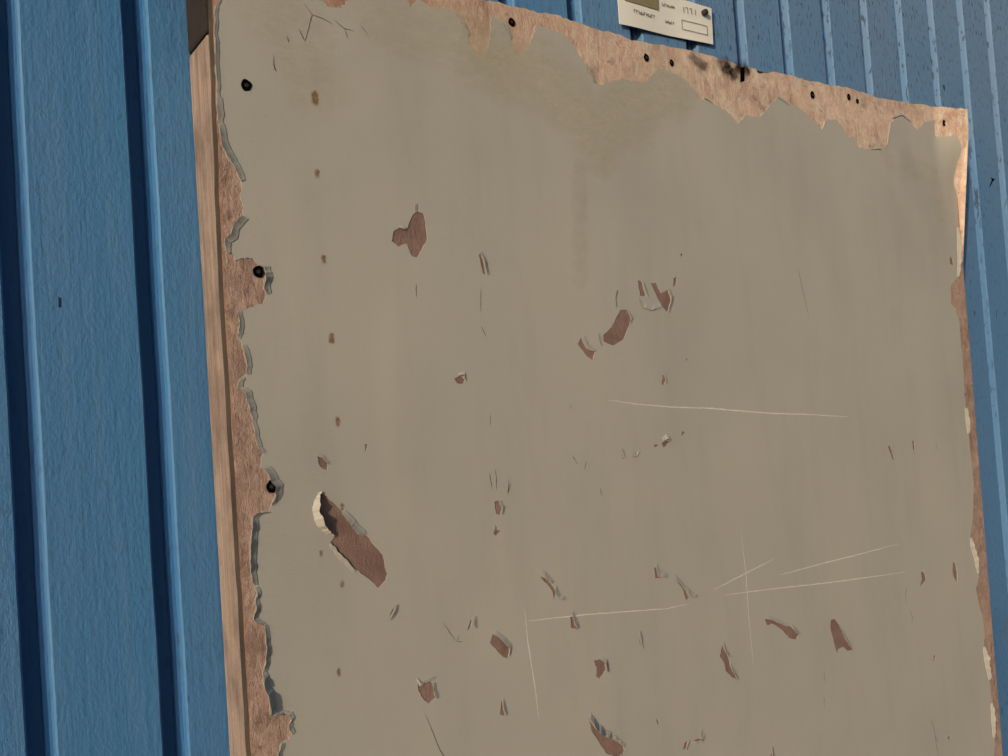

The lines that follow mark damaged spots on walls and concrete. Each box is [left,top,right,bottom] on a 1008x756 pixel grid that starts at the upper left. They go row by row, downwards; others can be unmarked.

peeling [408,0,968,151]
peeling [392,204,427,258]
peeling [638,277,676,312]
peeling [578,290,633,361]
peeling [214,0,295,756]
peeling [949,198,1003,756]
peeling [312,491,387,588]
peeling [417,677,439,704]
peeling [490,631,512,658]
peeling [594,658,610,678]
peeling [830,619,854,653]
peeling [590,714,626,756]